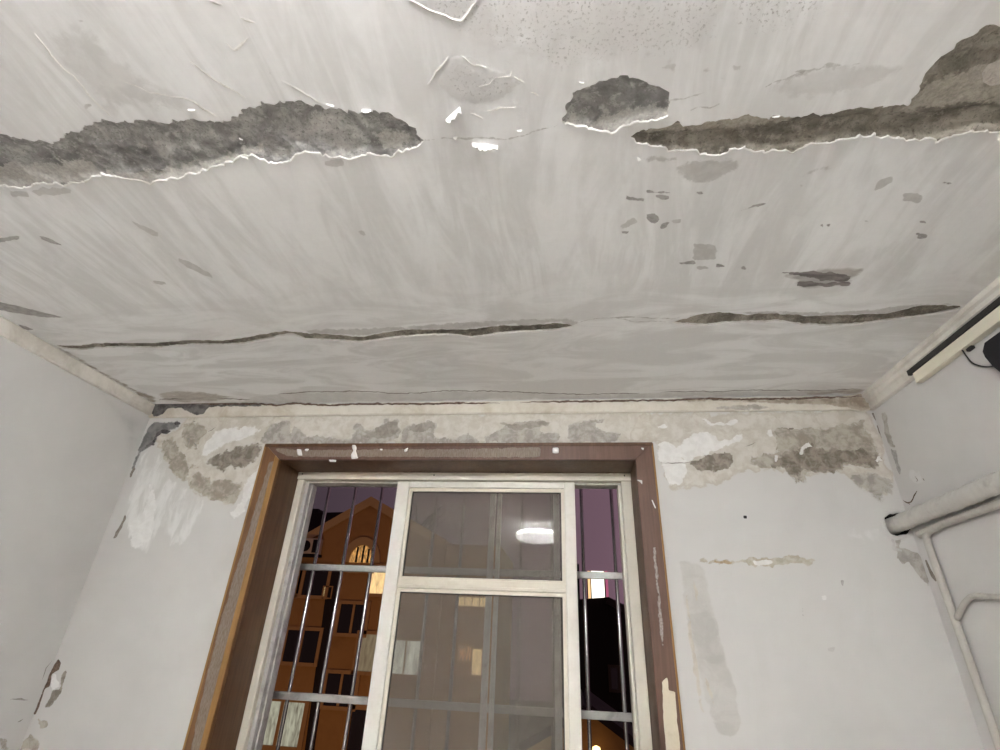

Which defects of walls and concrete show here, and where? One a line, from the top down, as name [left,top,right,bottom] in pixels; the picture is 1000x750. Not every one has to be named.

spalling [0,18,424,198]
peeling [428,56,537,123]
spalling [562,24,1000,195]
peeling [625,189,671,202]
peeling [619,213,682,234]
peeling [678,243,726,270]
crack [56,302,961,350]
peeling [872,412,902,475]
peeling [122,447,206,560]
peeling [693,554,818,570]
spalling [0,659,67,750]
peeling [662,678,680,750]